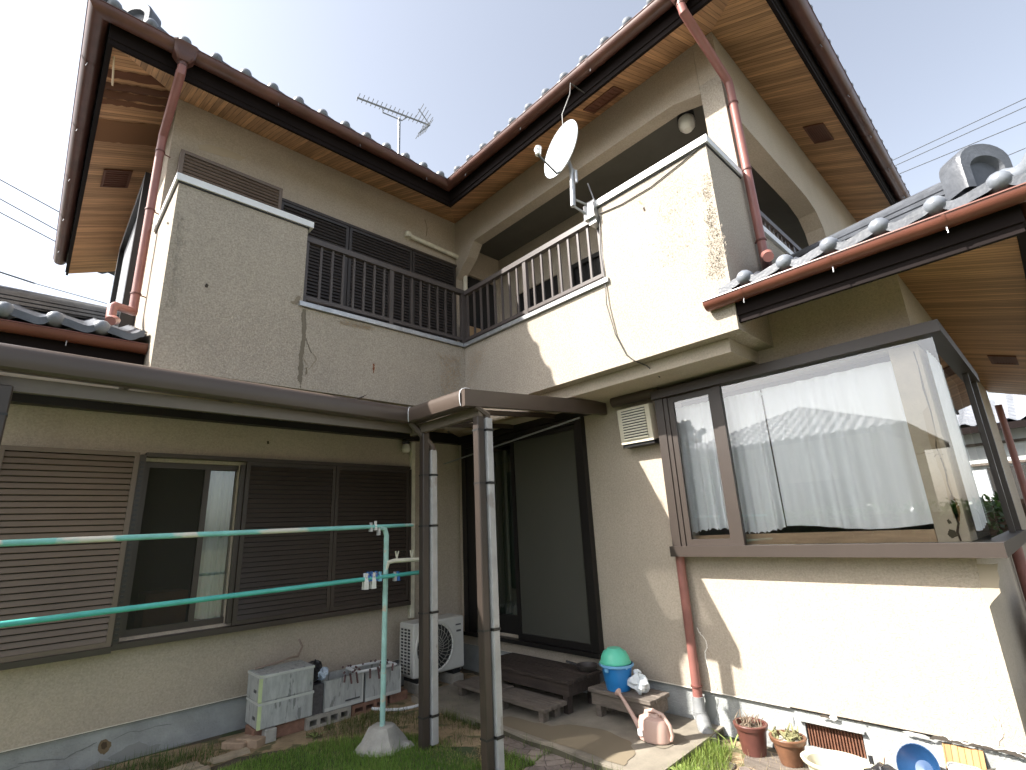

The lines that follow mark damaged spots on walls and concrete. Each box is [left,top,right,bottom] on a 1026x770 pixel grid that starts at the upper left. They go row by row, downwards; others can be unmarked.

crack [697,628,717,688]
damp [503,716,687,765]